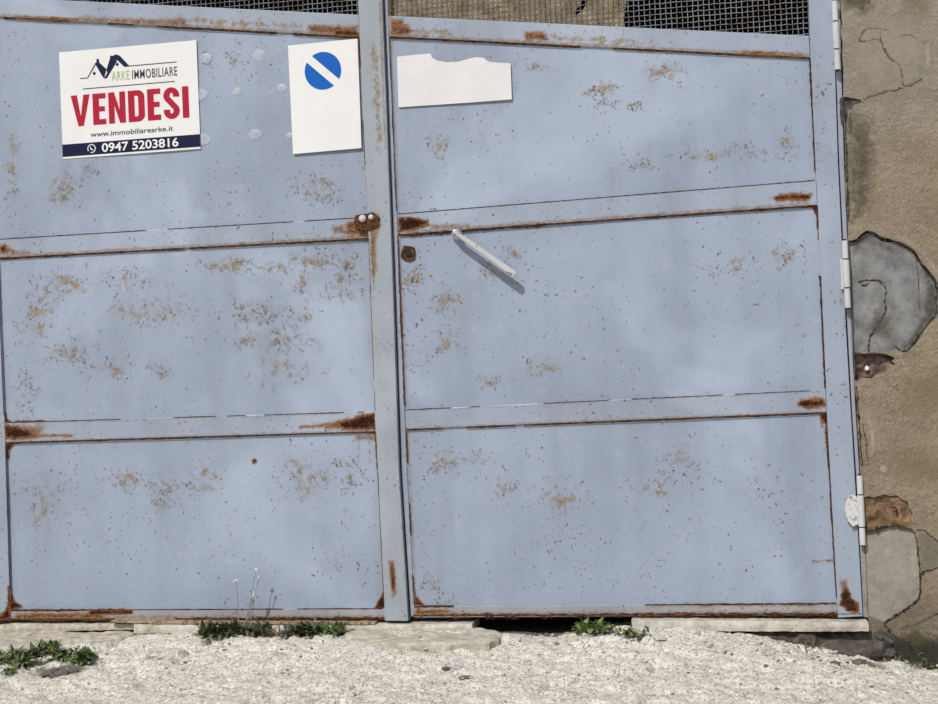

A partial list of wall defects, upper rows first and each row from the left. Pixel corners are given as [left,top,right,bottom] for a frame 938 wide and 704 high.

rust [0,0,819,410]
spalling [847,231,938,381]
rust [405,427,443,462]
rust [412,276,862,620]
spalling [861,494,938,621]